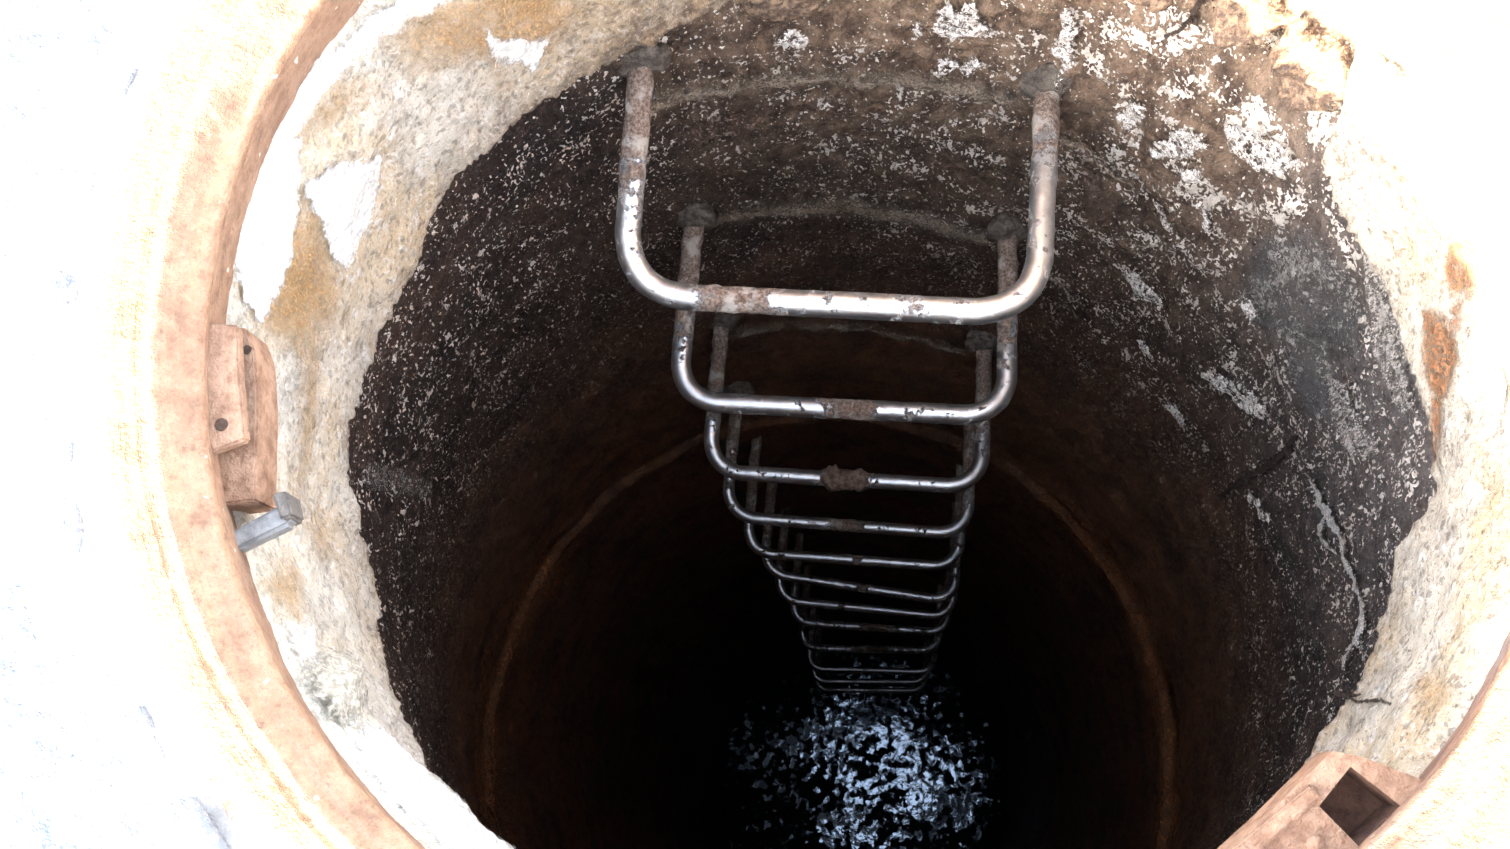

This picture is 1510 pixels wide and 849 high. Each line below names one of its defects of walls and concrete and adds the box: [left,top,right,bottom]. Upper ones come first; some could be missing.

spalling [741,0,824,22]
water stain [775,29,809,50]
efflorescence [912,0,996,79]
efflorescence [1051,8,1081,91]
spalling [1127,0,1173,11]
spalling [1211,0,1348,112]
efflorescence [1116,101,1146,130]
efflorescence [1150,124,1300,185]
rust [702,285,765,313]
rust [1422,235,1483,459]
crack [1218,435,1391,705]
rust [472,538,579,839]